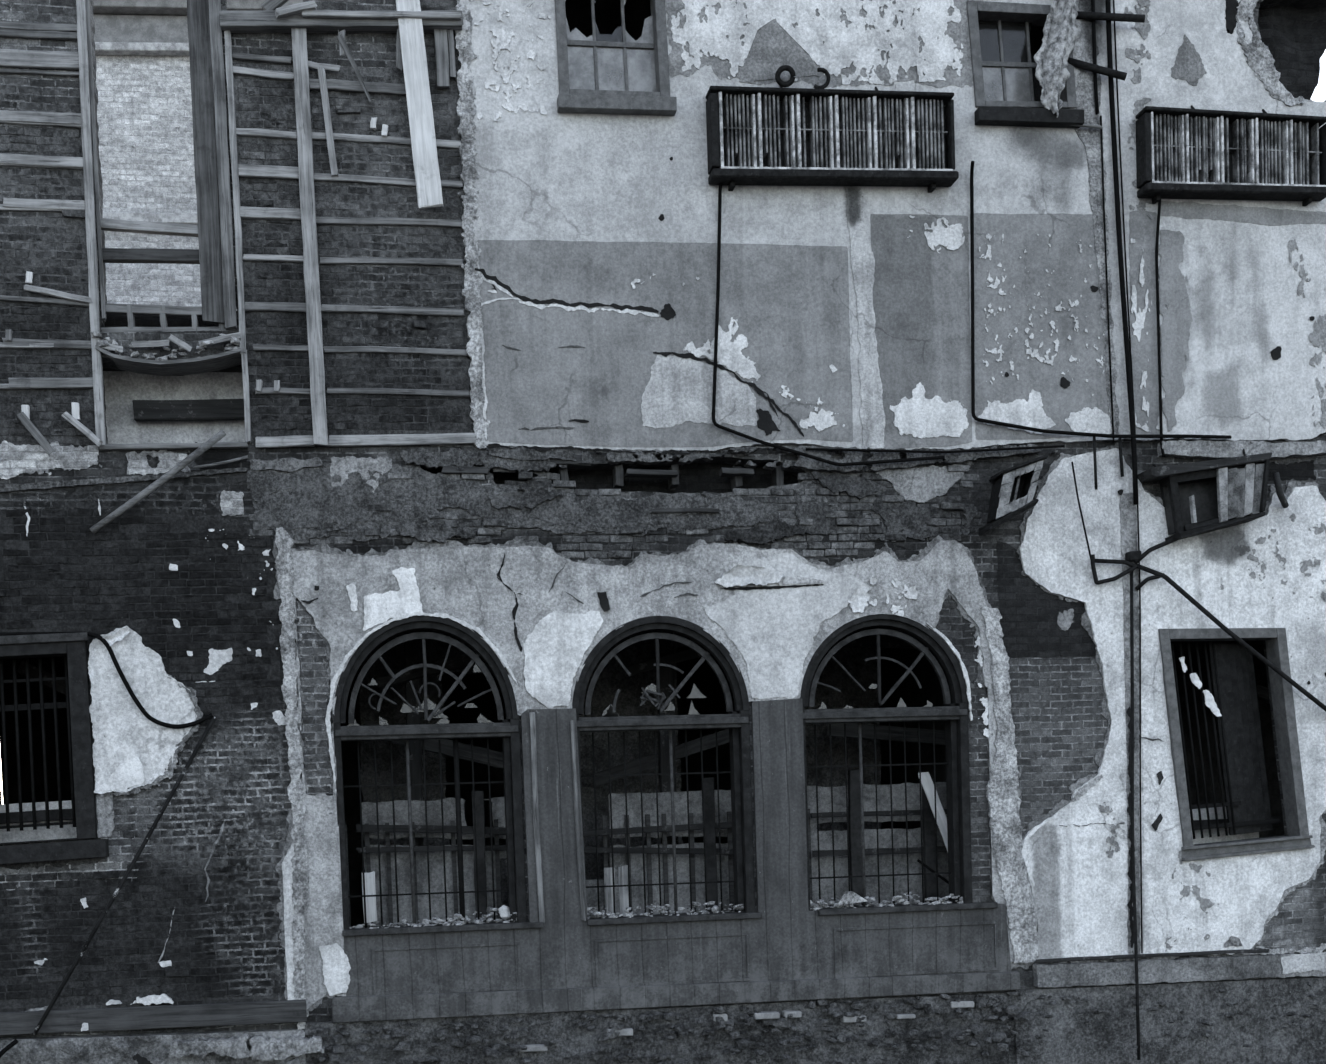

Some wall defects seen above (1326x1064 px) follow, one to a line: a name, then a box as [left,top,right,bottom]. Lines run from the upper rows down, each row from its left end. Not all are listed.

peeling [665,0,983,88]
spalling [1225,0,1312,107]
peeling [907,215,965,253]
crack [475,268,712,455]
crack [653,352,804,437]
spalling [756,408,781,436]
peeling [889,234,1112,439]
peeling [1309,314,1326,429]
spalling [1268,460,1316,481]
crack [497,554,589,652]
spalling [1240,529,1326,602]
spalling [1172,851,1219,914]